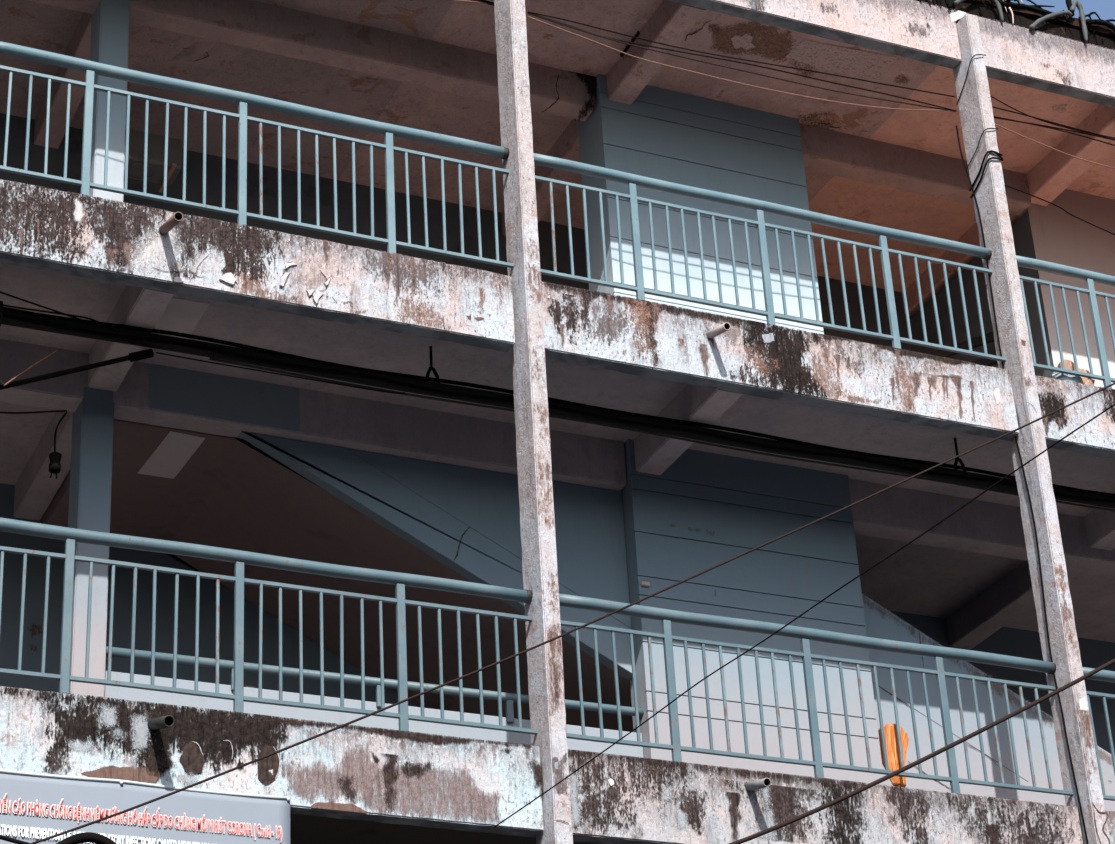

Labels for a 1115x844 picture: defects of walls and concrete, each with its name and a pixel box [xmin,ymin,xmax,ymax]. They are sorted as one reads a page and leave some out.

water stain [0,181,285,284]
peeling [131,229,238,286]
flaking render [279,262,352,305]
water stain [356,249,487,303]
water stain [544,281,975,419]
corrosion [891,349,916,412]
water stain [1038,389,1067,434]
water stain [1099,386,1115,422]
water stain [968,668,1052,725]
water stain [0,687,543,822]
water stain [568,749,868,844]
water stain [878,784,1075,844]